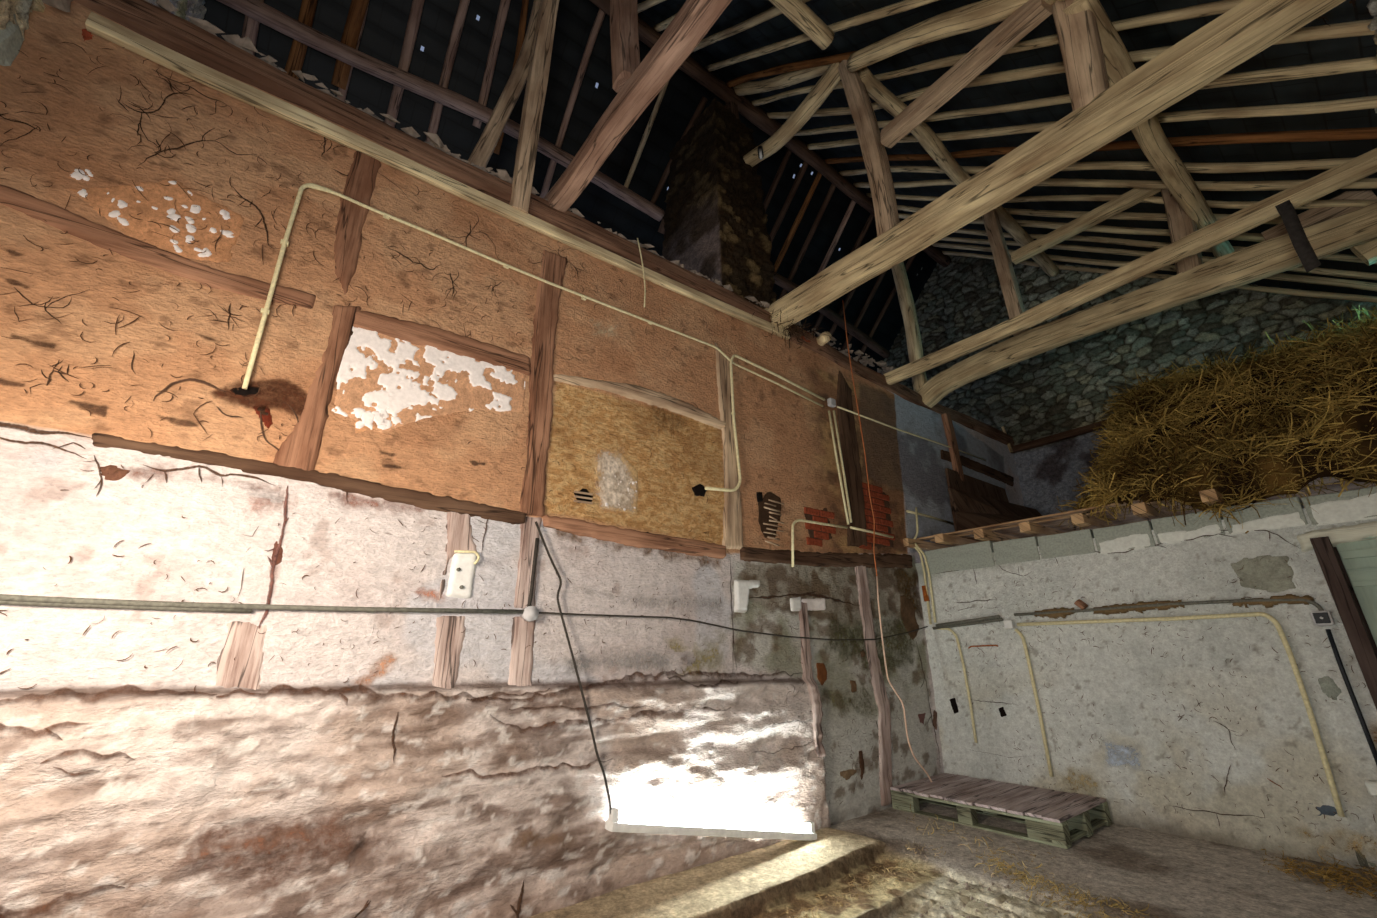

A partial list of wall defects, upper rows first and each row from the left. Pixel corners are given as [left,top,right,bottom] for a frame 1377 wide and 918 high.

peeling [69,169,244,263]
peeling [332,327,526,433]
water stain [253,407,273,429]
crack [0,422,103,496]
crack [144,378,348,629]
flaking render [804,507,836,547]
flaking render [859,482,895,550]
water stain [825,568,924,673]
crack [390,713,398,762]